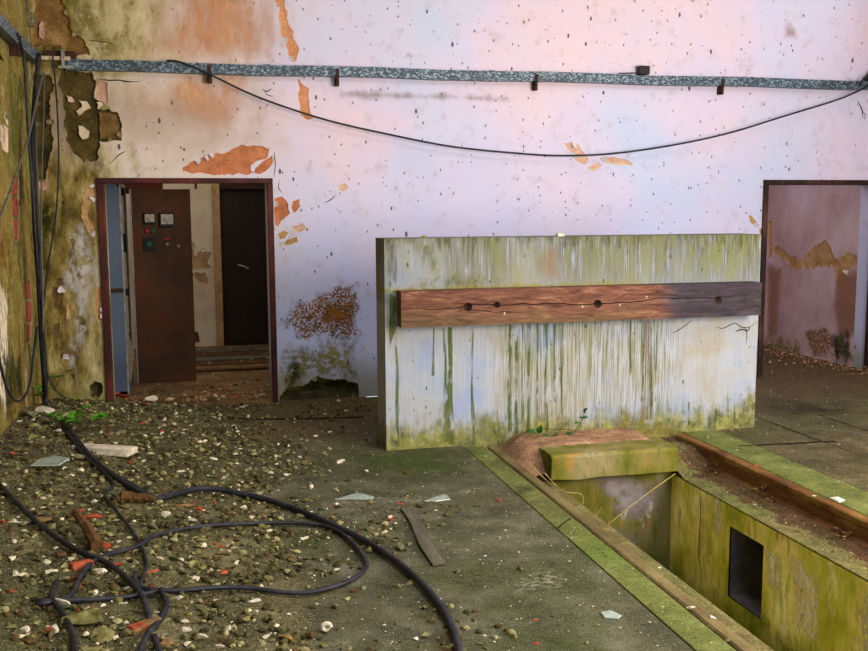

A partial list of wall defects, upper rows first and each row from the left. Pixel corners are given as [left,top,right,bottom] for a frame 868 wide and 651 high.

flaking render [31,0,90,59]
peeling [275,0,299,62]
flaking render [33,71,122,191]
peeling [182,145,273,175]
peeling [298,79,313,120]
peeling [274,197,307,248]
peeling [748,214,857,283]
leakage [0,282,8,412]
leakage [432,327,454,444]
leakage [515,324,563,435]
leakage [629,321,658,418]
leakage [792,556,818,640]